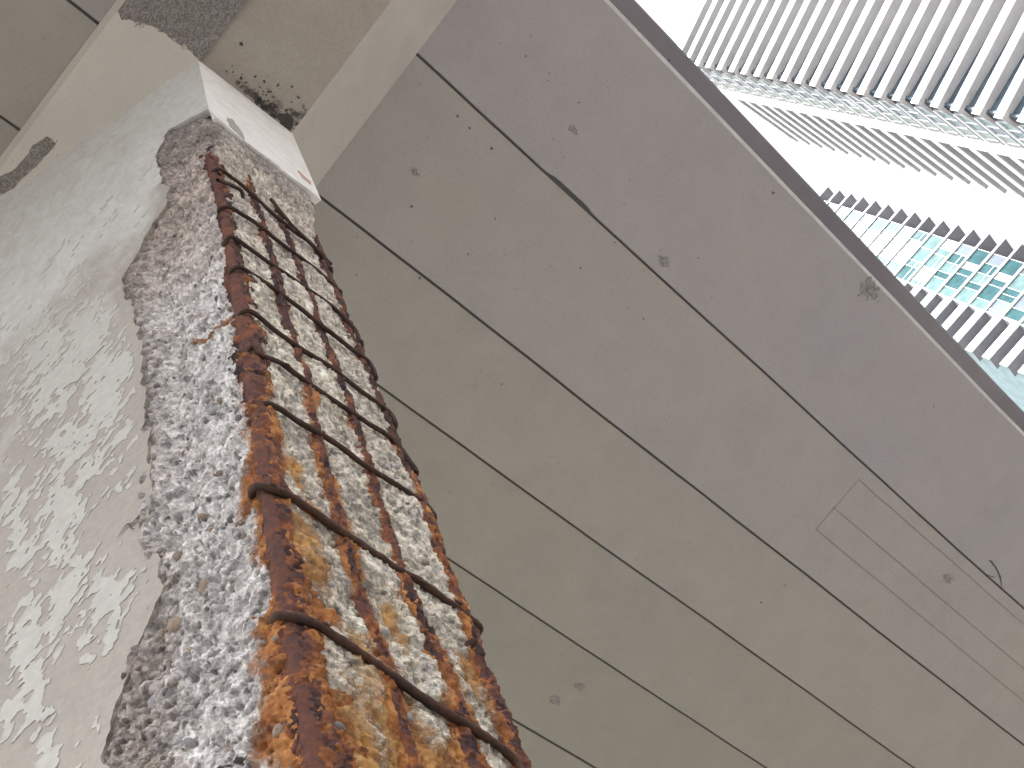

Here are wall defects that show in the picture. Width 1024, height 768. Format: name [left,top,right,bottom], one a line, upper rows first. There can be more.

flaking render [118,0,247,62]
leakage [226,65,306,131]
corrosion [193,313,235,344]
spalling [0,99,531,768]
corrosion [238,351,529,768]